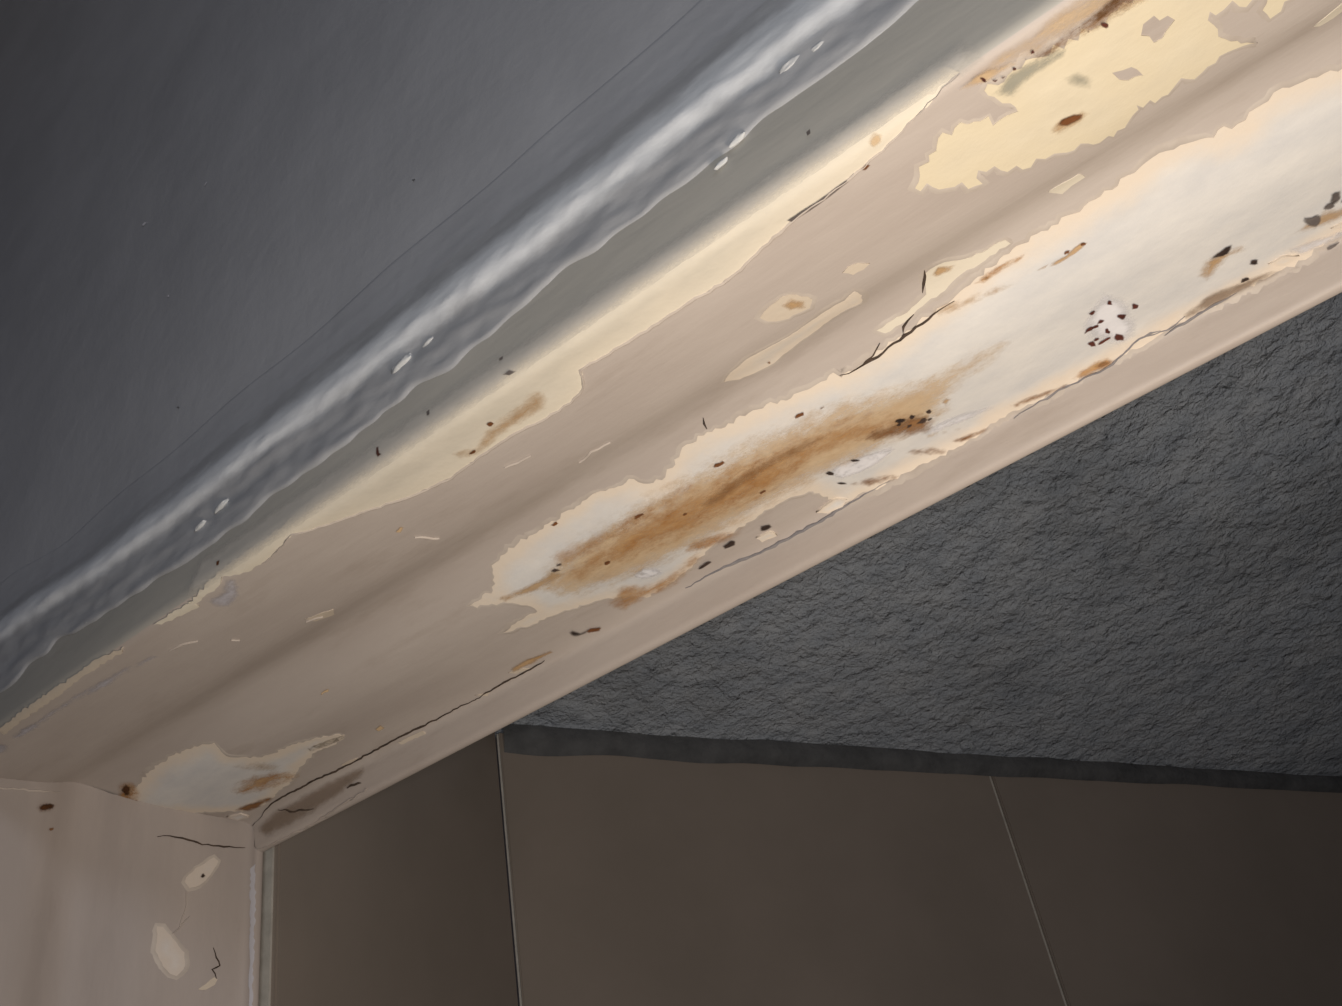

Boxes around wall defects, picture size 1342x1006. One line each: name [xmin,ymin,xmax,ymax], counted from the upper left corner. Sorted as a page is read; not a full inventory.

rust [1031,0,1129,54]
peeling [907,0,1295,196]
peeling [154,49,966,625]
peeling [466,63,1342,634]
rust [1080,360,1110,377]
rust [1085,301,1138,347]
rust [507,377,953,599]
peeling [0,647,123,752]
rust [121,785,135,799]
peeling [129,733,346,821]
crack [252,660,545,849]
peeling [150,835,245,980]